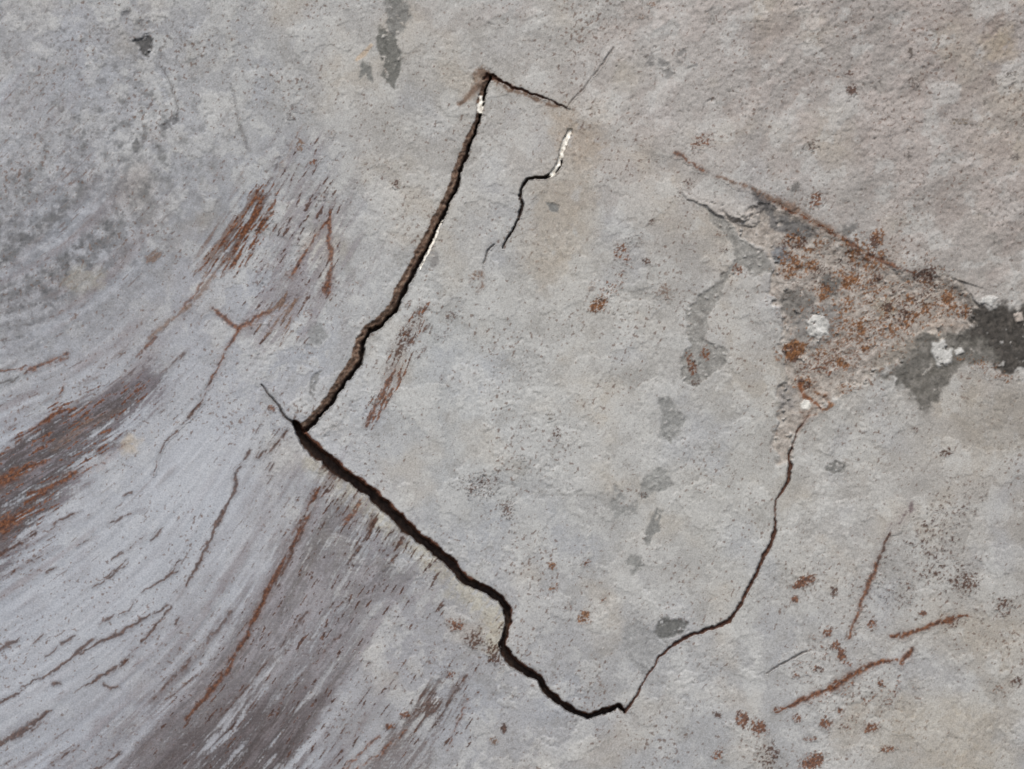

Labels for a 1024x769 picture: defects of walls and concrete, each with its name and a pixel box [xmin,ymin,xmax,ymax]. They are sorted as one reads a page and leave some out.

corrosion [0,104,366,598]
corrosion [0,404,507,769]
corrosion [334,299,458,464]
crack [260,46,809,719]
corrosion [710,745,728,761]
peeling [679,194,1024,467]
corrosion [713,477,990,769]
corrosion [938,446,955,457]
corrosion [990,595,1019,618]